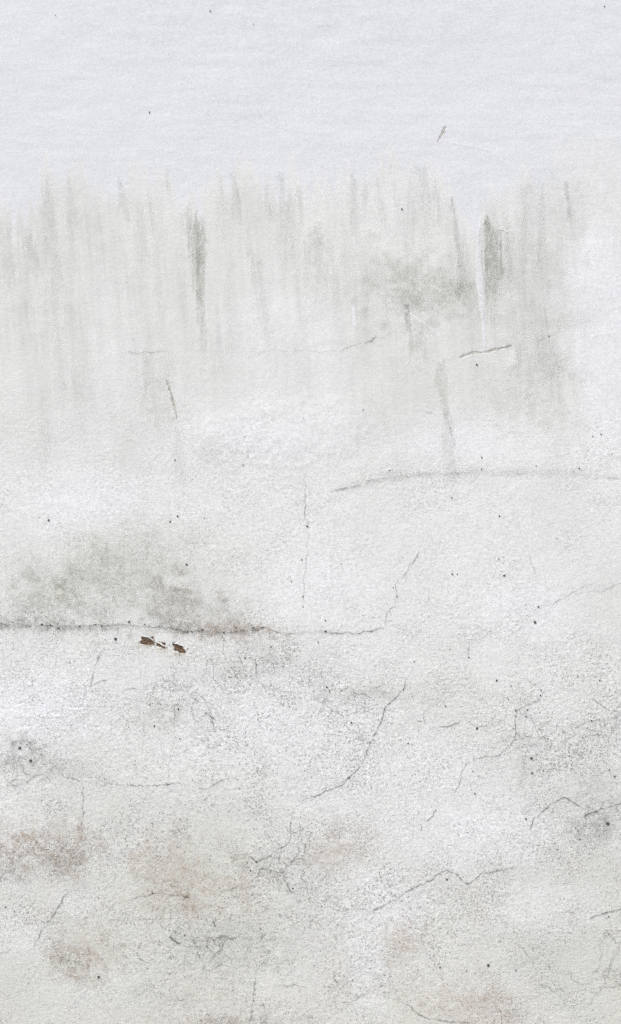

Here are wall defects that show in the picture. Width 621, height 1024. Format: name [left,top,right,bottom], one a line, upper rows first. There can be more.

crack [251,819,309,892]